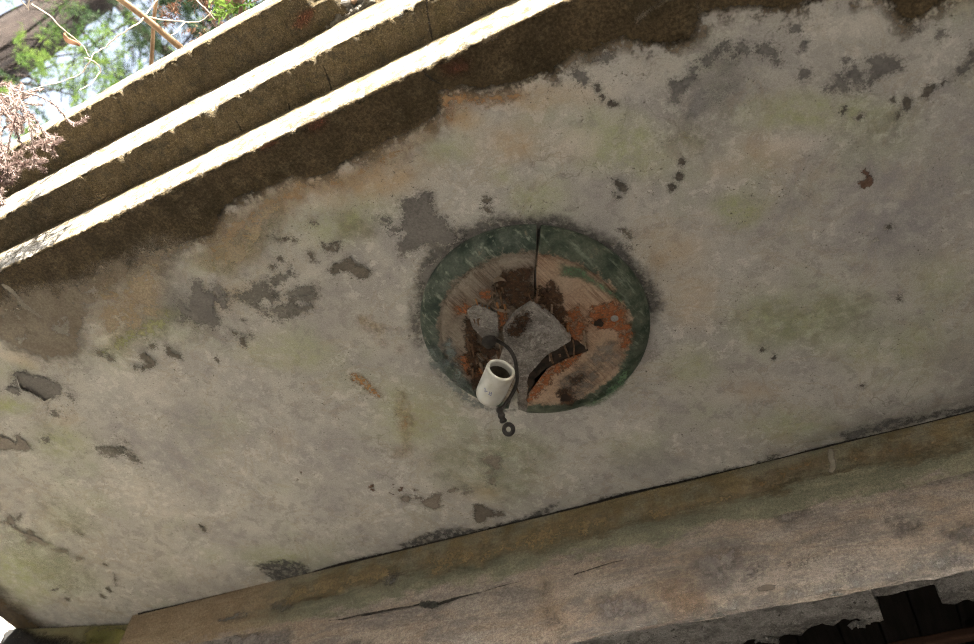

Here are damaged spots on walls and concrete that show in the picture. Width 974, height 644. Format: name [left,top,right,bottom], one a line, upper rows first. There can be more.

leakage [849,0,958,36]
peeling [666,39,781,104]
peeling [823,53,904,122]
leakage [0,0,822,361]
peeling [272,235,373,280]
peeling [380,191,459,289]
peeling [174,256,322,349]
peeling [5,370,75,417]
leakage [400,505,611,576]
leakage [256,559,397,612]
crack [330,582,517,621]
leakage [594,553,959,636]